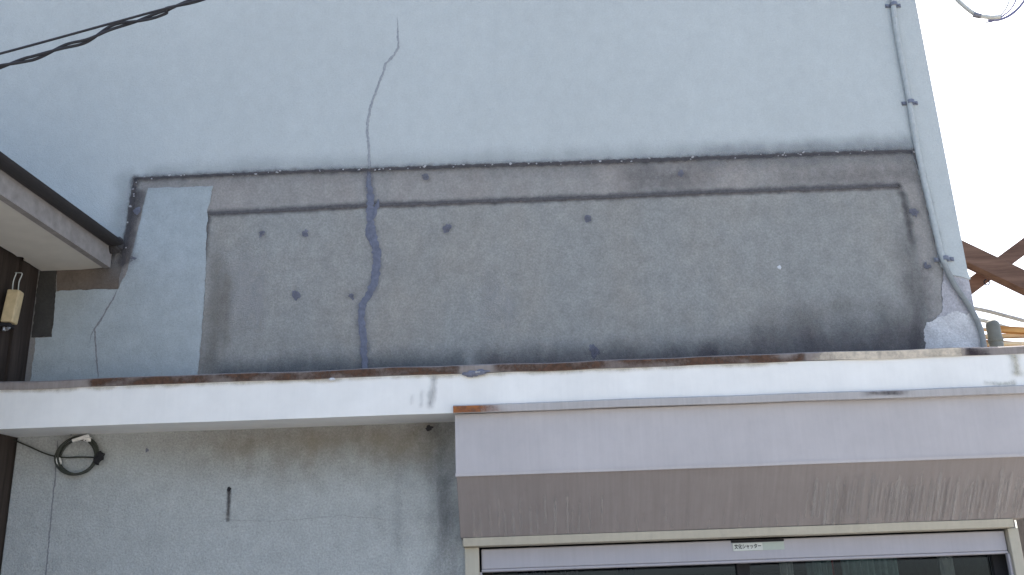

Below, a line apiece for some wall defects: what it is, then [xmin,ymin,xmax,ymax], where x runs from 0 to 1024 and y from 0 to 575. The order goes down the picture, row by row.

crack [206,19,911,369]
crack [89,289,118,376]
leakage [732,336,916,355]
corrosion [495,353,804,371]
corrosion [90,366,458,386]
corrosion [453,405,488,413]